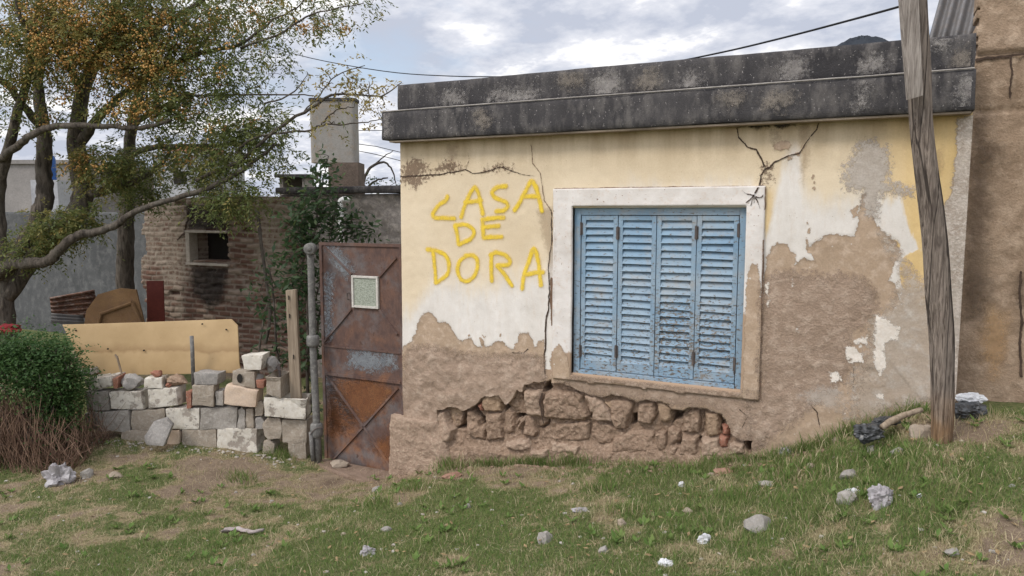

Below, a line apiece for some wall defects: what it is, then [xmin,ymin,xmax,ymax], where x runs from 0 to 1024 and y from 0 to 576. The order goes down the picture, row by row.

water stain [475,89,538,127]
water stain [559,73,619,94]
water stain [760,56,806,110]
water stain [858,55,883,105]
water stain [953,51,972,107]
crack [737,123,819,210]
crack [400,146,720,424]
peeling [347,194,931,466]
crack [739,240,764,427]
corrosion [328,379,393,438]
corrosion [373,436,390,458]